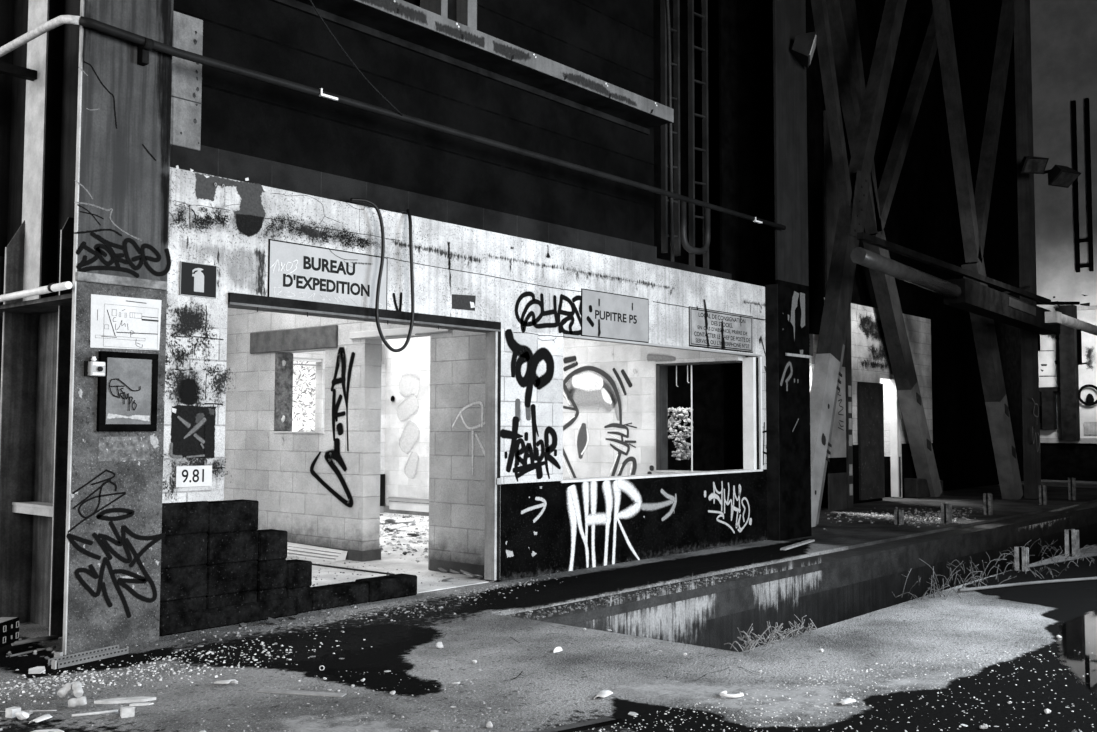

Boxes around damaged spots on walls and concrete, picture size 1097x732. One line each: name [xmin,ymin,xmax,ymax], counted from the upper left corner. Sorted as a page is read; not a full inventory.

damp [255,215,381,295]
damp [393,240,674,295]
damp [165,302,234,409]